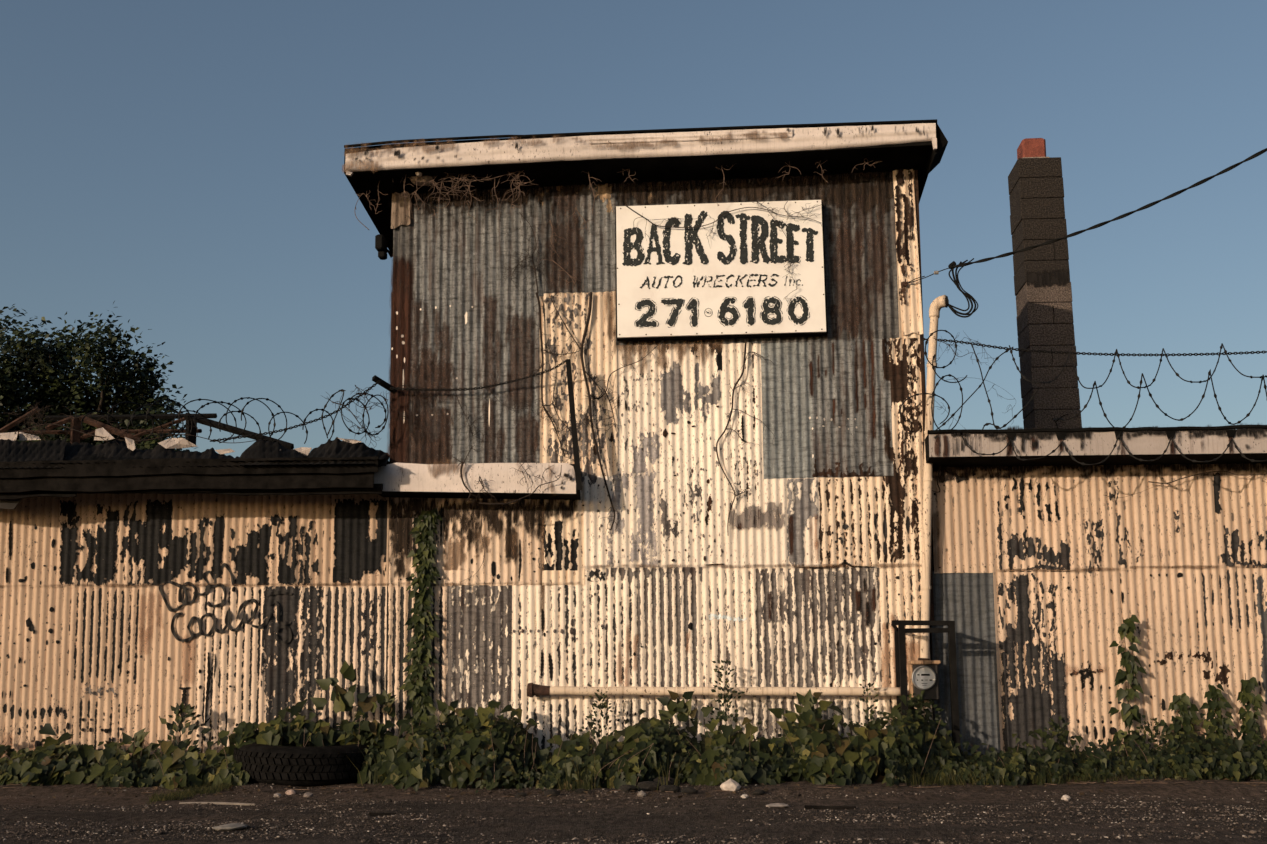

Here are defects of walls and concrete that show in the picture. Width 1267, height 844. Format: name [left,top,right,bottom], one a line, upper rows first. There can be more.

rust [545,185,584,292]
rust [388,257,455,464]
rust [482,296,540,463]
rust [809,195,920,567]
rust [934,434,948,458]
rust [989,433,1038,456]
peeling [0,499,417,753]
rust [710,515,842,568]
peeling [955,473,1157,760]